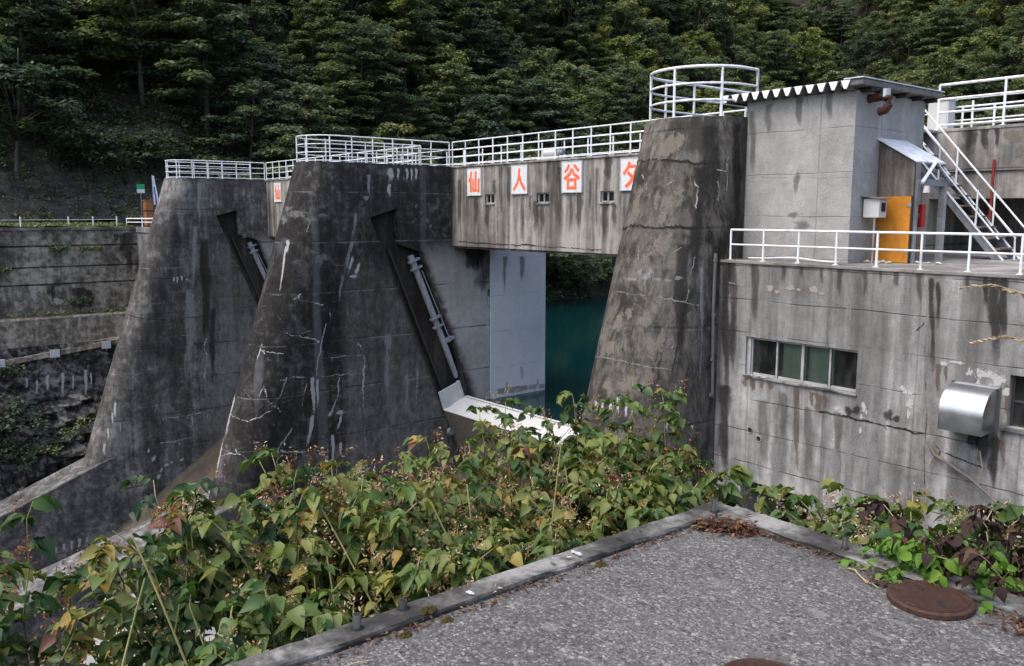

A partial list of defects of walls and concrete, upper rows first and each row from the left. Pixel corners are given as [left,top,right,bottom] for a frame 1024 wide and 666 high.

leakage [387,168,418,196]
leakage [173,183,216,376]
crack [596,156,729,371]
spalling [767,285,825,295]
leakage [929,278,957,351]
leakage [983,277,1021,347]
crack [155,294,378,475]
leakage [307,377,319,443]
leakage [719,263,737,460]
peeling [941,361,1010,396]
crack [819,411,985,484]
leakage [967,435,999,483]